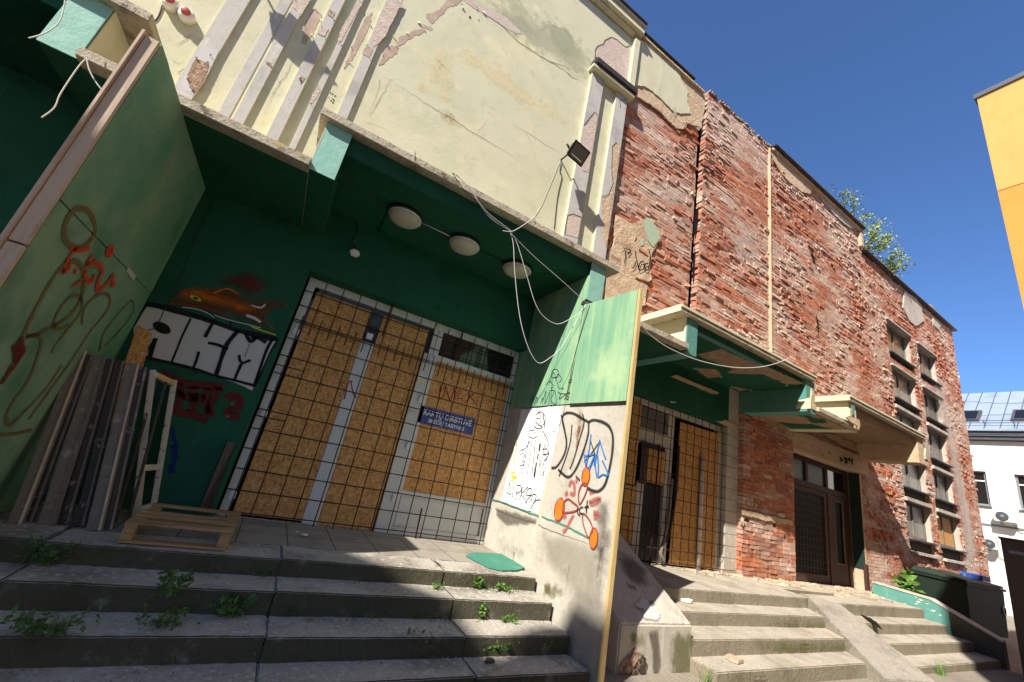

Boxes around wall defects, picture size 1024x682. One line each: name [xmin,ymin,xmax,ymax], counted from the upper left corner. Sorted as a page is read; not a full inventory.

peeling [291,0,522,69]
flaking render [181,45,218,95]
peeling [298,76,320,105]
crack [370,79,552,161]
flaking render [581,112,598,172]
flaking render [564,214,581,238]
flaking render [602,142,661,306]